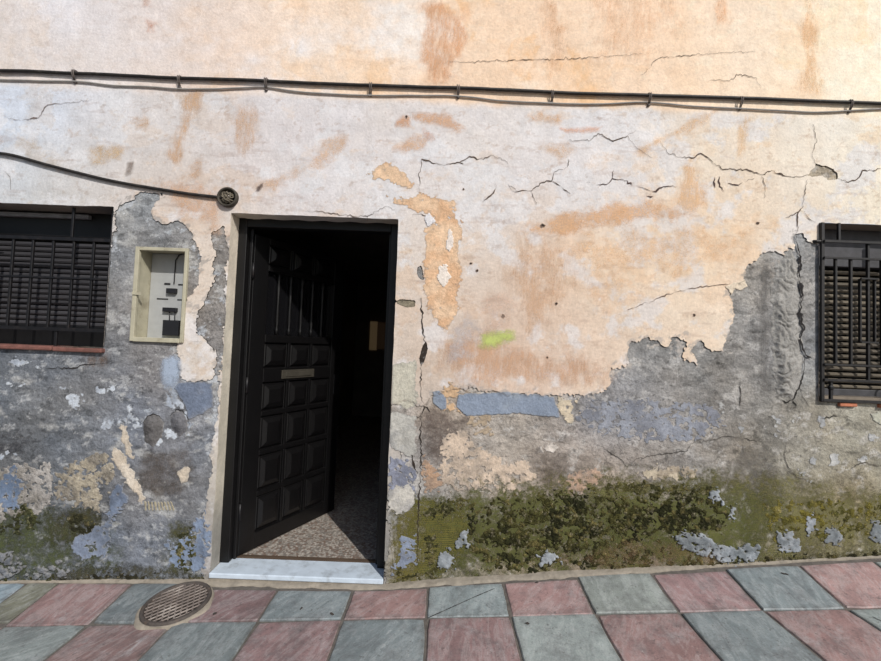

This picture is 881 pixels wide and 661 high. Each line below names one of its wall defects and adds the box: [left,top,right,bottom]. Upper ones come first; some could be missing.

flaking render [366,162,464,330]
crack [418,155,508,186]
crack [485,162,569,203]
crack [571,125,853,422]
damp [0,551,70,580]
flaking render [0,191,229,581]
crack [411,368,430,573]
flaking render [384,233,881,583]